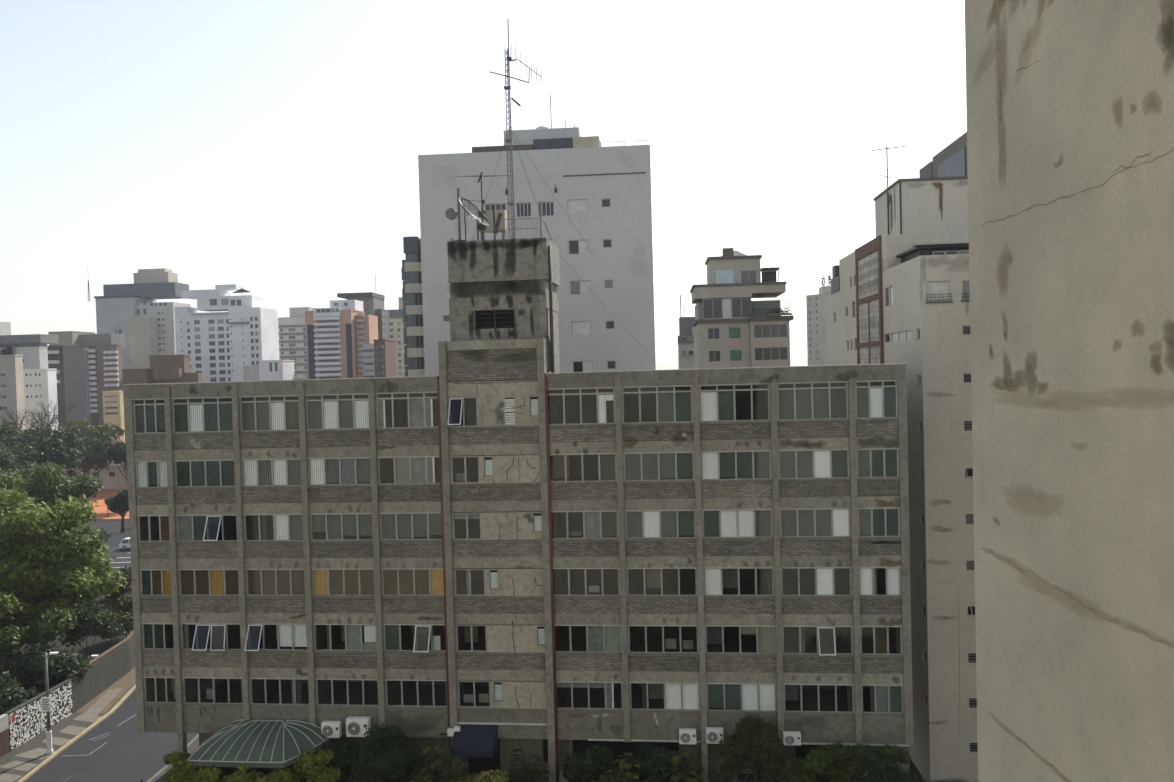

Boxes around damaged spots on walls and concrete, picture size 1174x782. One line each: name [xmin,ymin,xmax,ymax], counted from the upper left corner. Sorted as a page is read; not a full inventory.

damp [448,239,541,337]